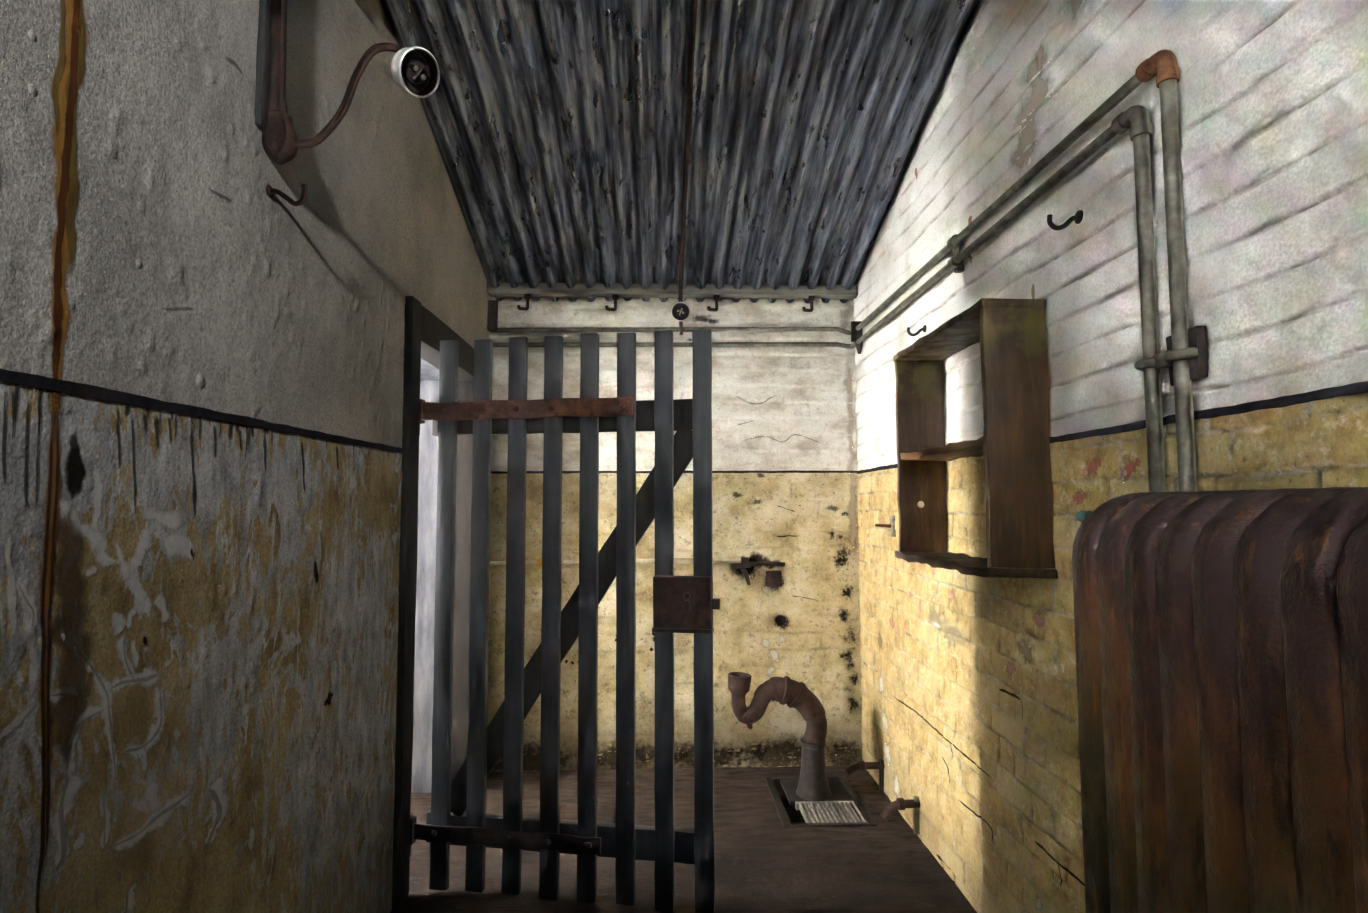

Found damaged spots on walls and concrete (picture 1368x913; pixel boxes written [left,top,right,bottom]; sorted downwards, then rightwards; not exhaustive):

corrosion [35,0,87,913]
leakage [828,531,850,568]
leakage [839,586,858,710]